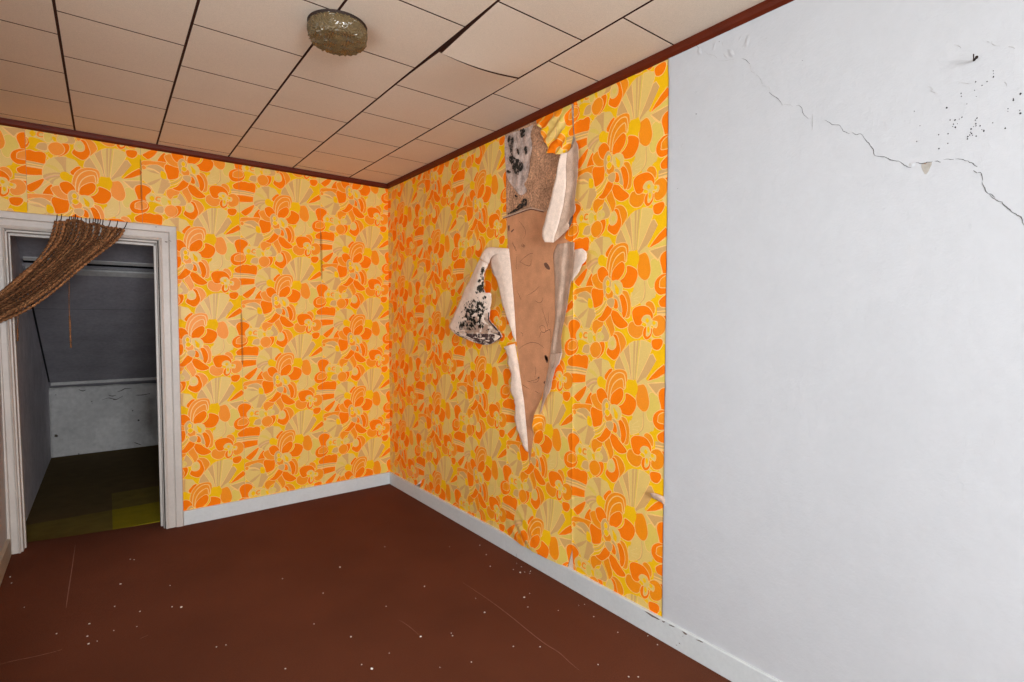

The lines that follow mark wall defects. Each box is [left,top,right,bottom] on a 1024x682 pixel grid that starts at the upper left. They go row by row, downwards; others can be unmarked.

mould [507,128,527,175]
flaking render [505,121,573,218]
crack [697,46,1024,225]
mould [454,267,502,345]